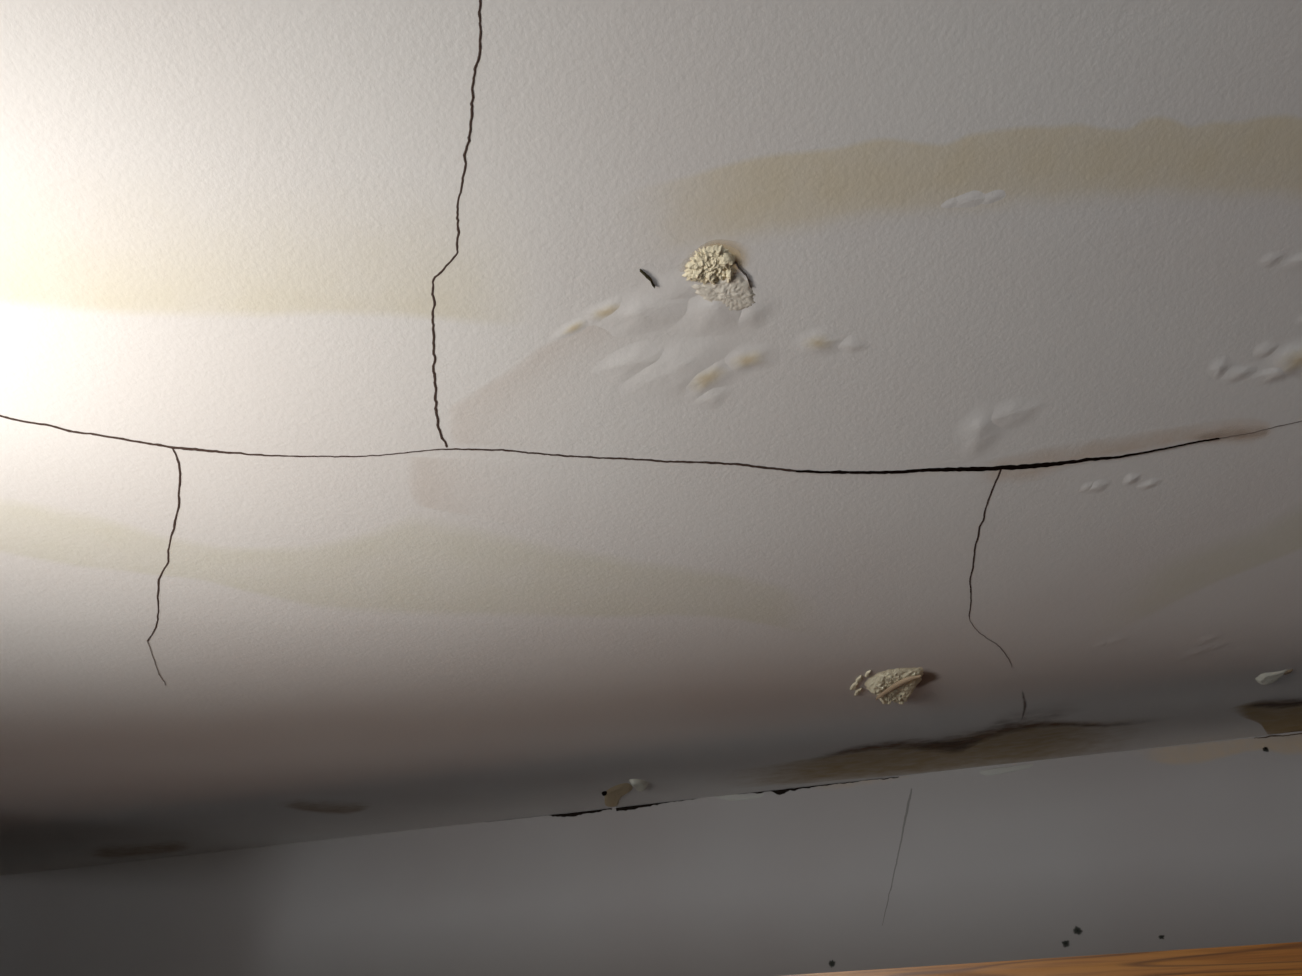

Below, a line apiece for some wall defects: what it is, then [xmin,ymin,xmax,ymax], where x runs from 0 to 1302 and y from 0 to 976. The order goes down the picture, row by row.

leakage [0,112,1302,451]
spalling [682,244,756,311]
crack [0,0,1302,685]
leakage [0,494,849,653]
leakage [1046,492,1302,656]
spalling [850,667,944,705]
peeling [1255,669,1293,685]
peeling [602,779,647,807]
leakage [679,696,1302,793]